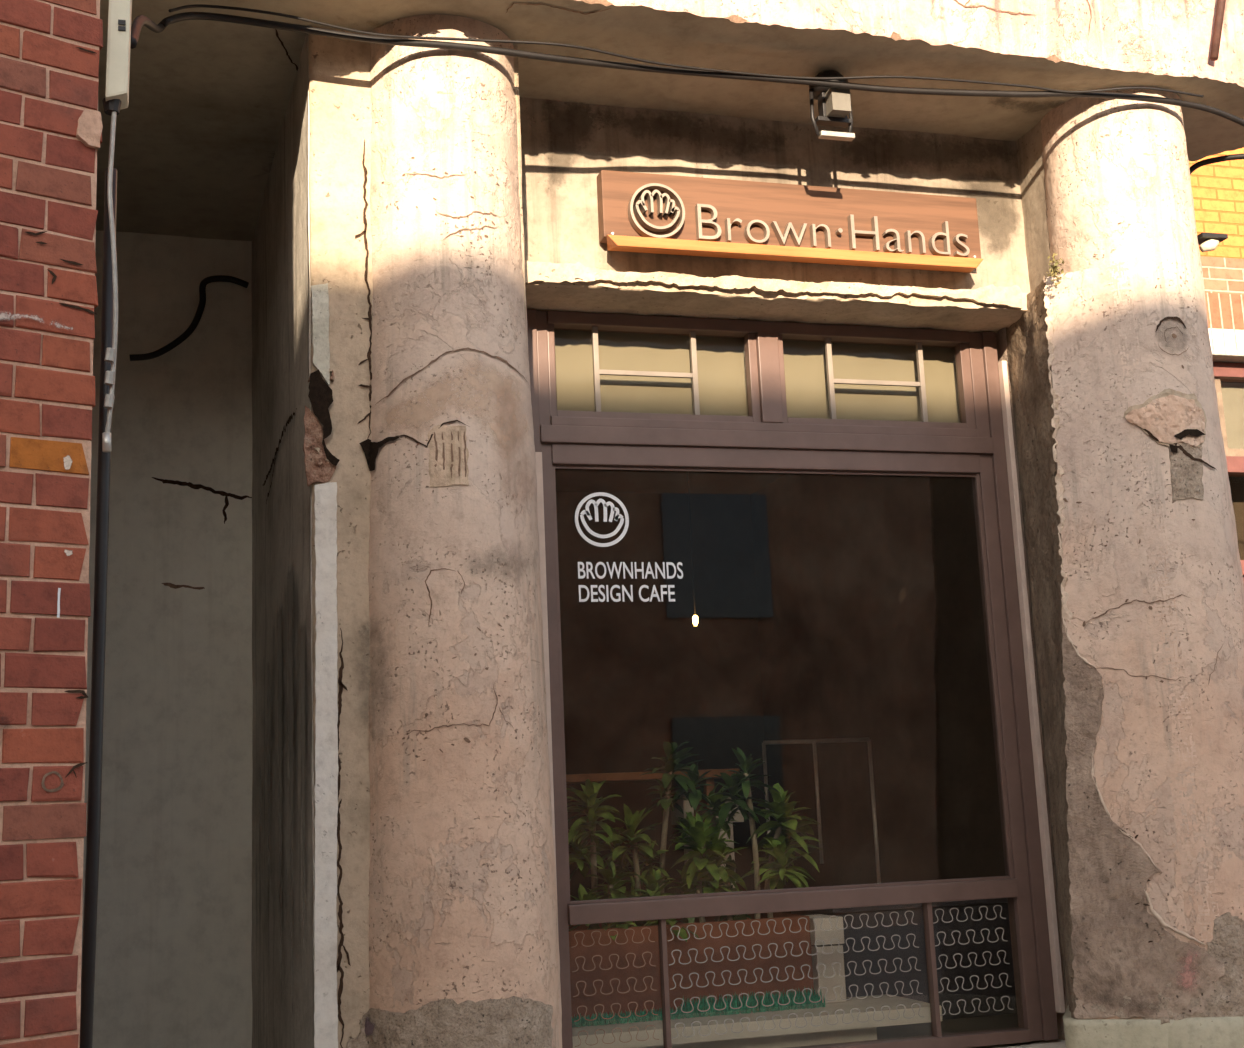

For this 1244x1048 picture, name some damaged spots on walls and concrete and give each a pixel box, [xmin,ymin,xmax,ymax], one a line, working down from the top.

water stain [0,313,72,329]
crack [152,408,297,524]
peeling [303,367,554,1048]
crack [355,139,526,439]
crack [1086,594,1187,623]
spalling [1043,279,1244,1025]